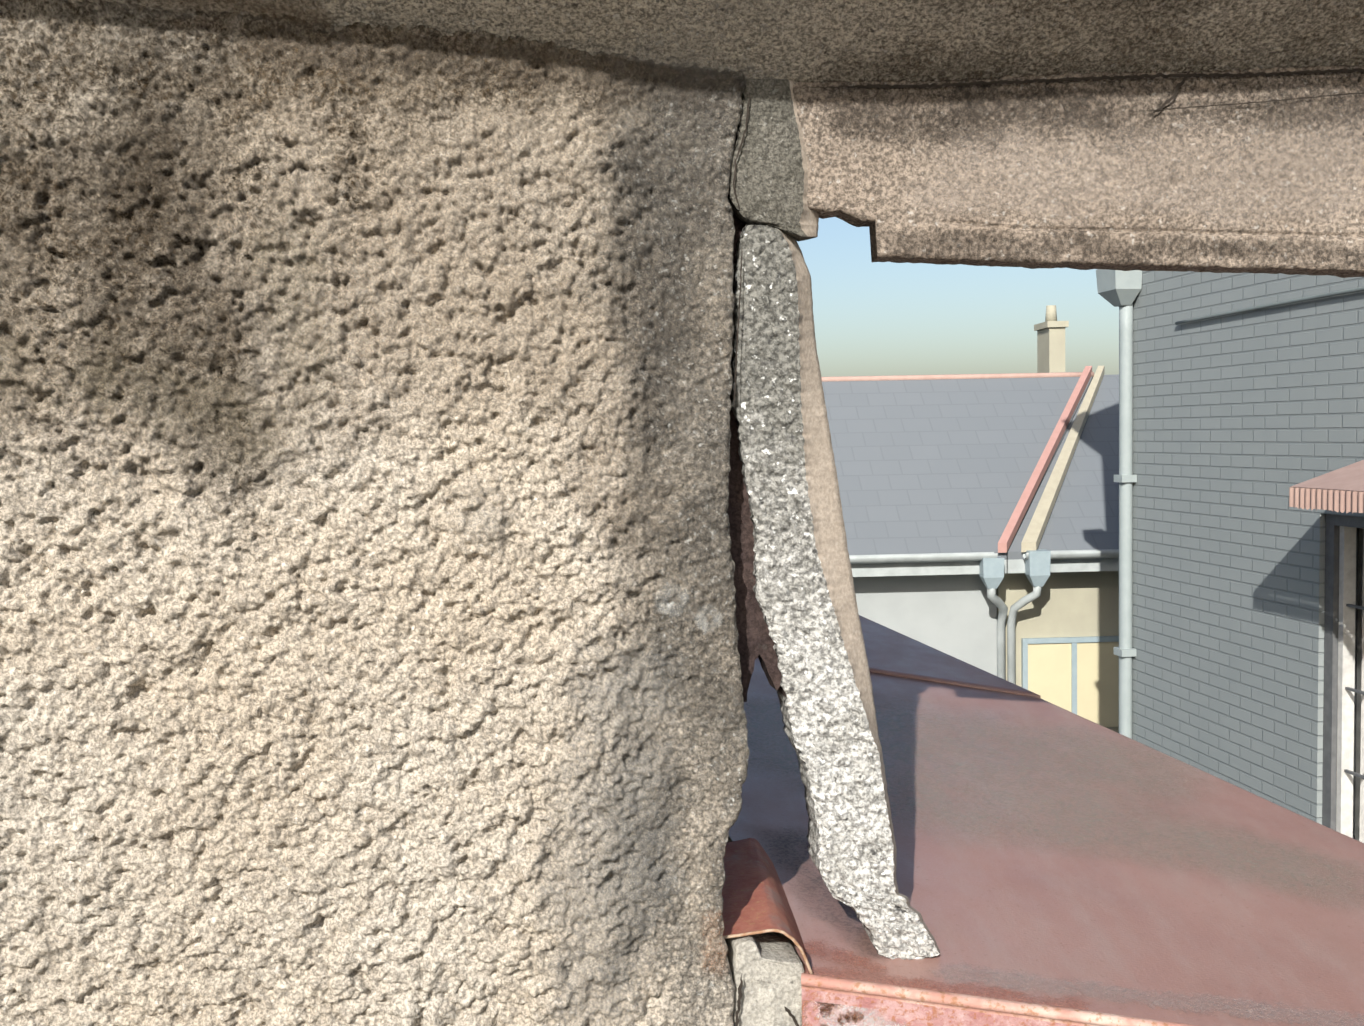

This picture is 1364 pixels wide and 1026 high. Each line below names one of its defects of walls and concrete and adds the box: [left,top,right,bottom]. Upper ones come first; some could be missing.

crack [806,68,1364,115]
damp [0,0,750,1025]
rust [804,942,1087,1010]